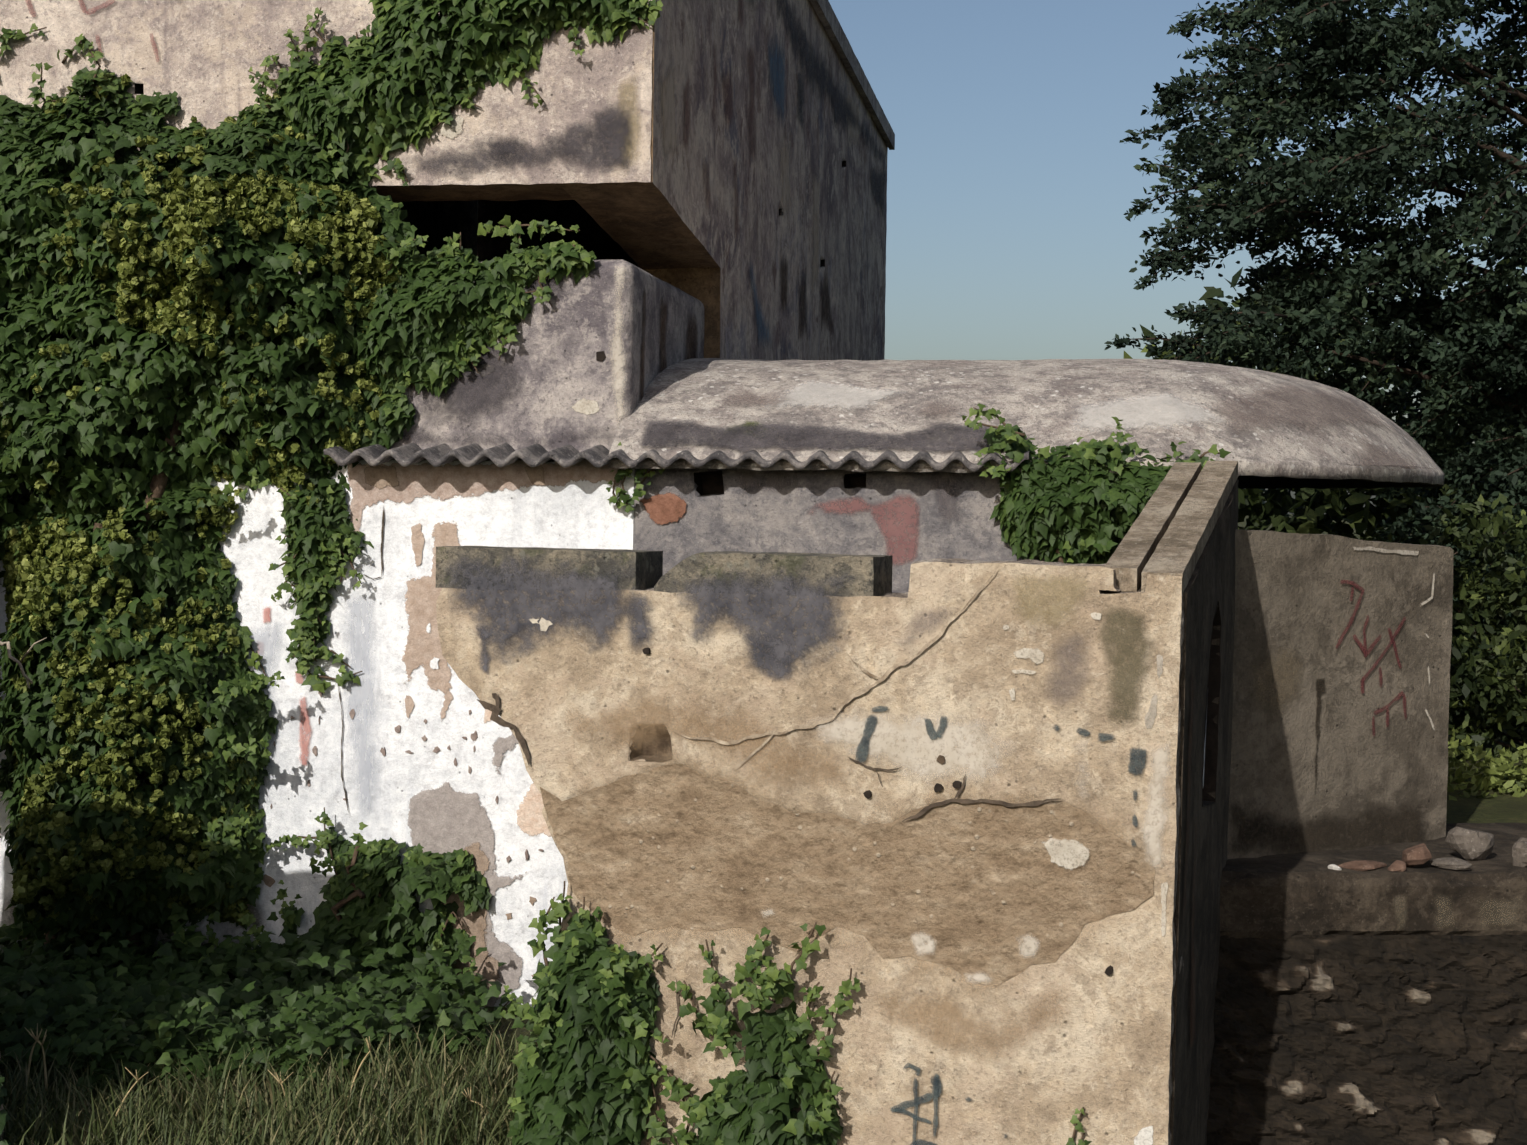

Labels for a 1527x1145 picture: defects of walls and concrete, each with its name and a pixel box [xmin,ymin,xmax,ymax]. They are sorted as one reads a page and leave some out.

damp [422,107,629,173]
peeling [347,459,624,531]
spalling [640,493,687,525]
peeling [820,497,918,563]
damp [451,558,651,673]
damp [686,576,842,679]
crack [477,693,530,766]
spalling [394,521,1168,1007]
crack [848,757,901,786]
crack [902,774,1061,822]